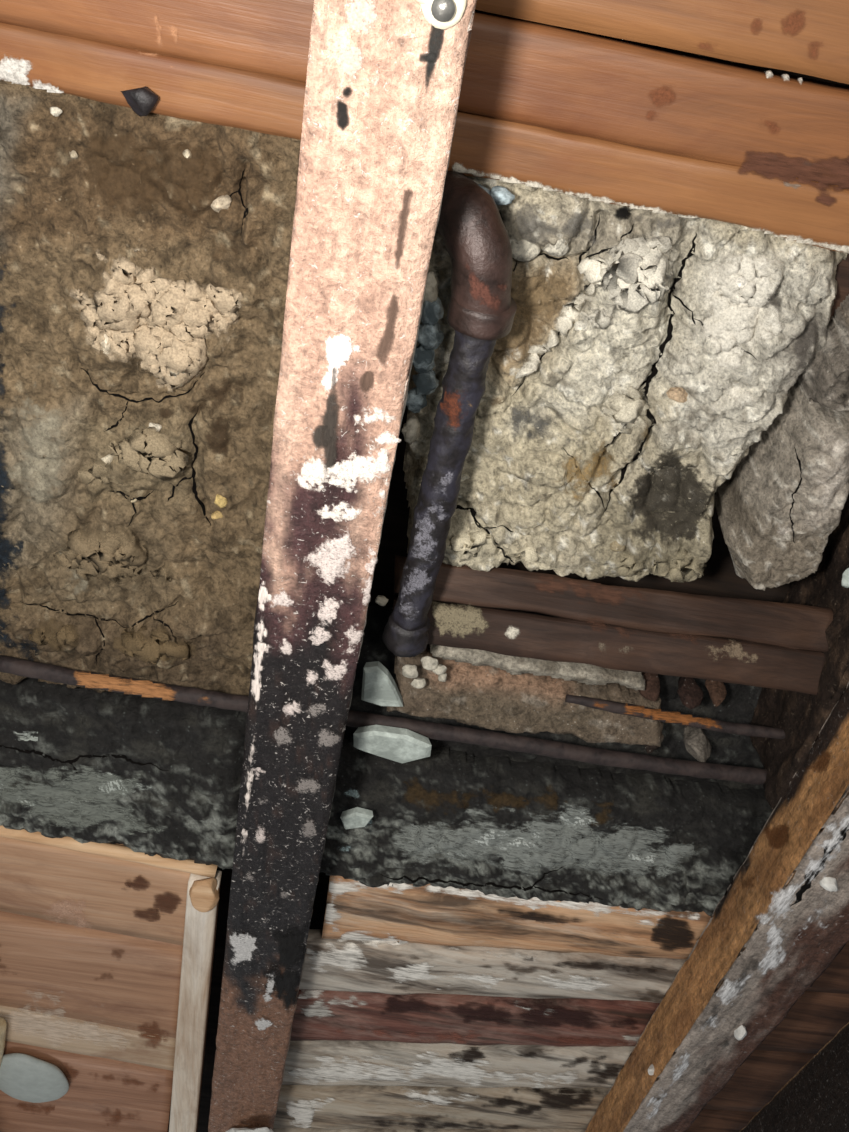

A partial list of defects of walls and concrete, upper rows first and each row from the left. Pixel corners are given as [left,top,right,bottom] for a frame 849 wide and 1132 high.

crack [81,368,211,526]
water stain [312,369,338,470]
rust [440,391,461,427]
crack [564,233,757,512]
crack [790,447,802,543]
rust [75,672,174,701]
rust [625,705,720,728]
water stain [0,765,166,835]
water stain [393,781,698,880]
peeling [306,881,411,972]
peeling [428,885,666,925]
peeling [288,1051,577,1106]